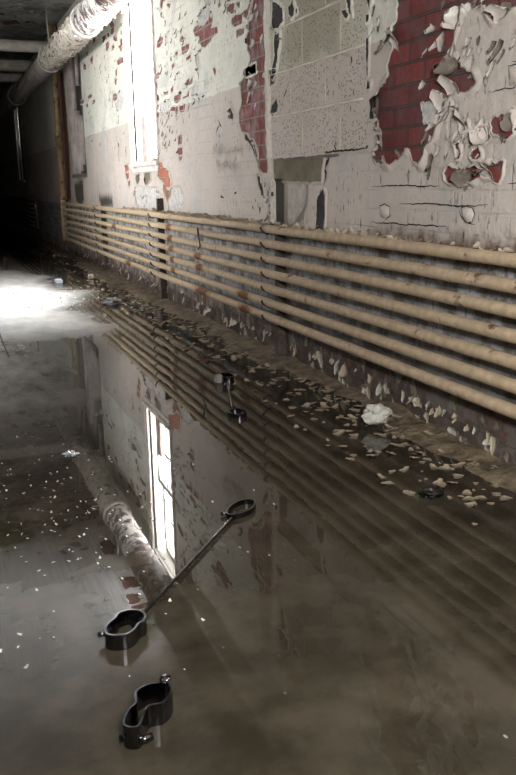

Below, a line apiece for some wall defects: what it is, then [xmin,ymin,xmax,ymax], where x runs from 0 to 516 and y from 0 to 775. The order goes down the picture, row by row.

peeling [40,0,130,152]
peeling [122,0,455,245]
peeling [365,0,516,192]